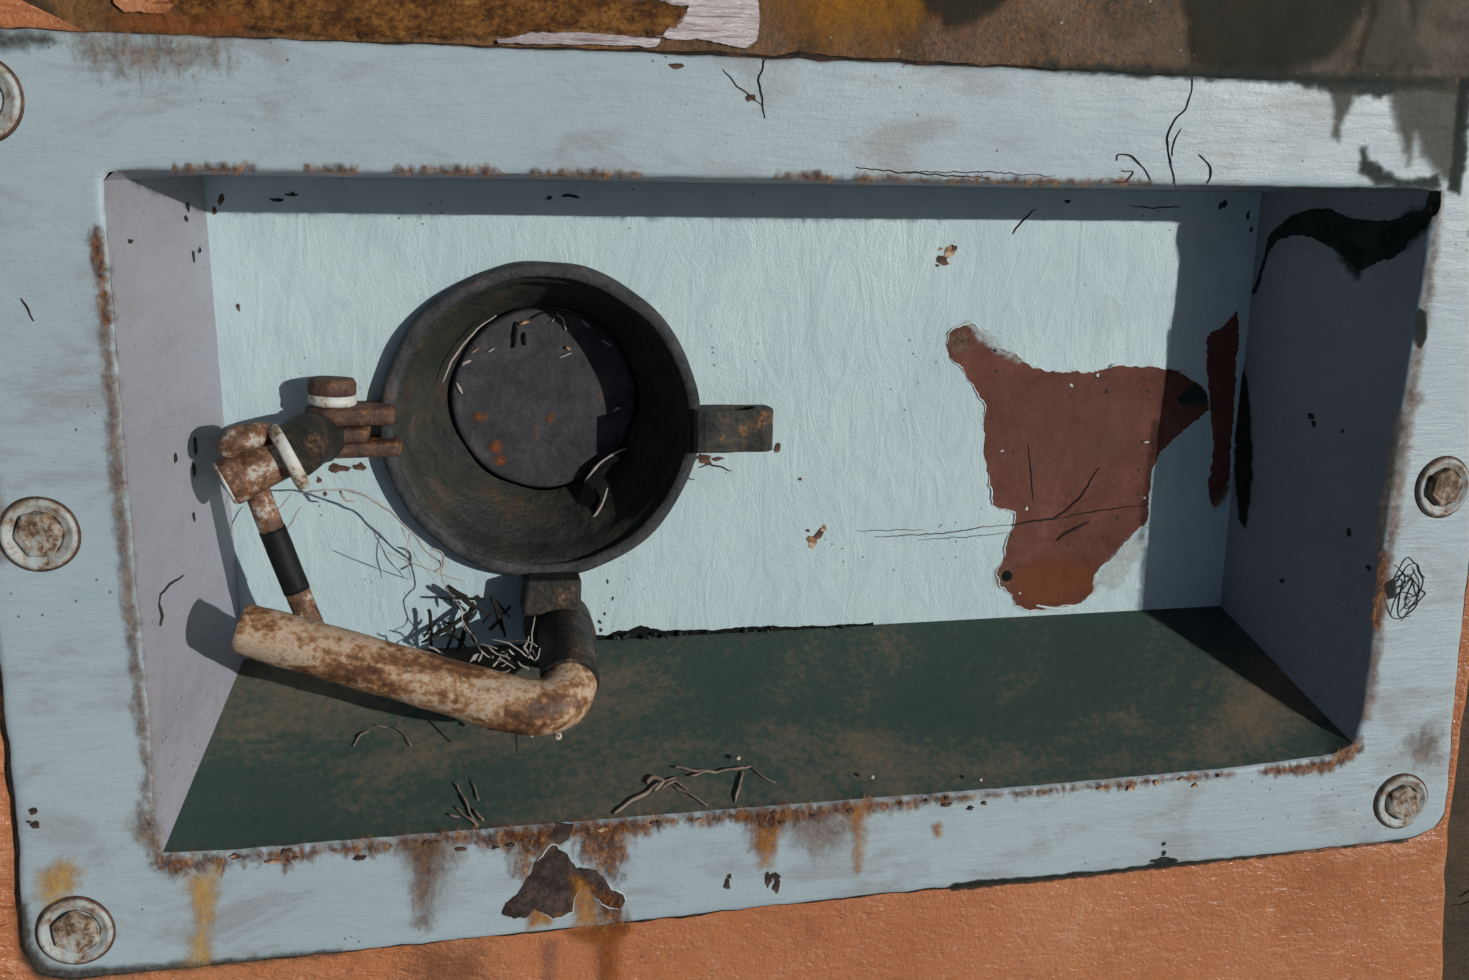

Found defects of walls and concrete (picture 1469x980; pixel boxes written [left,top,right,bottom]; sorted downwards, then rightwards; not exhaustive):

peeling [113,0,175,15]
rust [169,0,687,40]
peeling [497,0,759,48]
peeling [946,309,1240,611]
rust [1365,196,1443,715]
rust [91,227,1230,980]
rust [1262,742,1364,777]
rust [43,863,74,903]